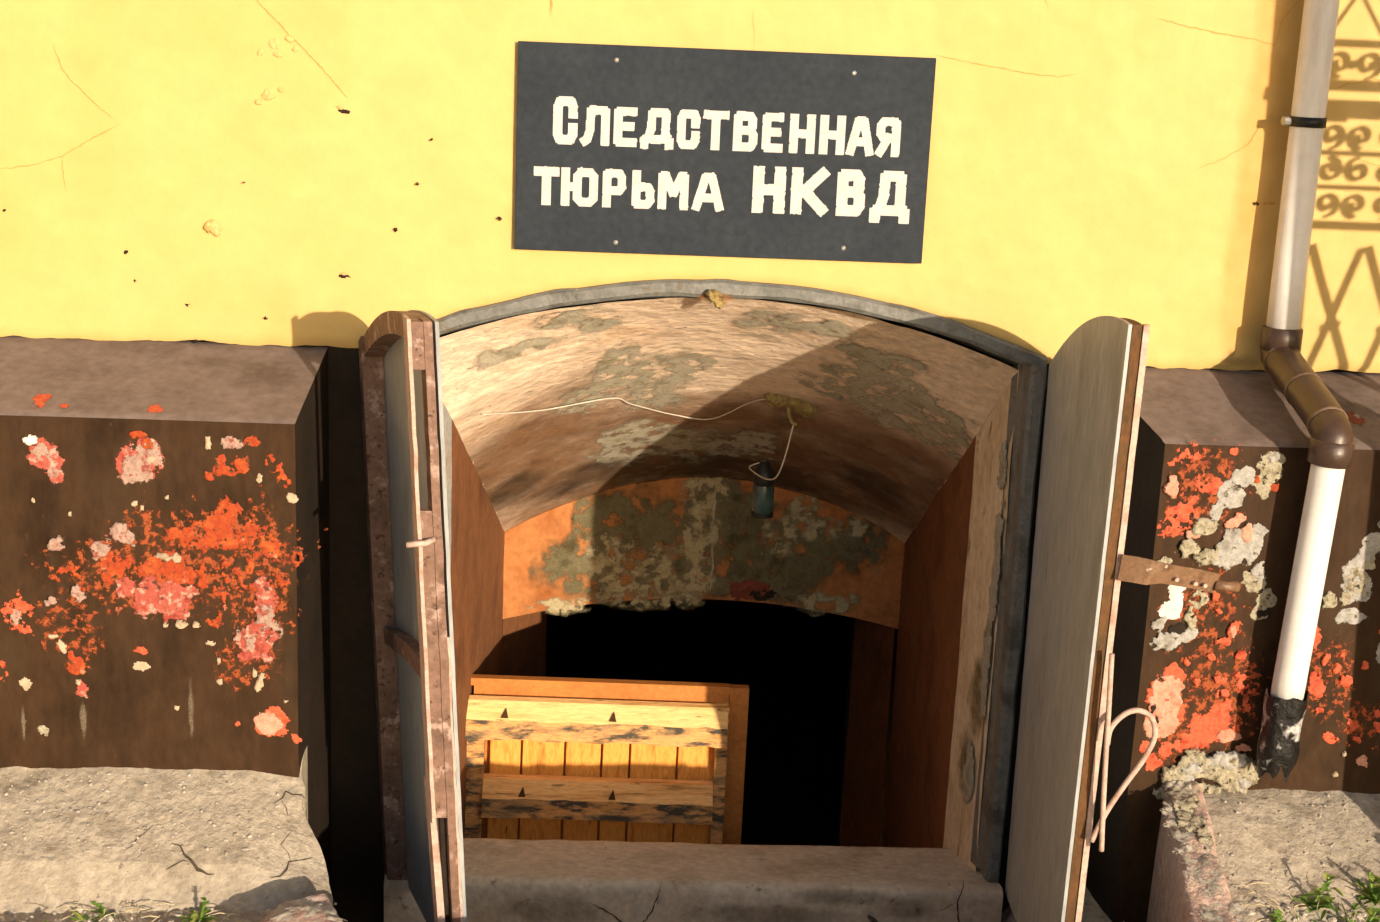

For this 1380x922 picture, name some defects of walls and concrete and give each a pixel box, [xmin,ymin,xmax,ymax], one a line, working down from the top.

crack [257,0,347,97]
leakage [476,309,624,369]
leakage [735,309,971,459]
peeling [22,434,65,484]
peeling [115,431,165,485]
peeling [204,435,299,504]
leakage [530,346,887,614]
peeling [0,495,304,698]
spalling [1308,521,1380,714]
peeling [235,700,303,744]
peeling [1139,443,1286,922]
peeling [1322,709,1380,777]